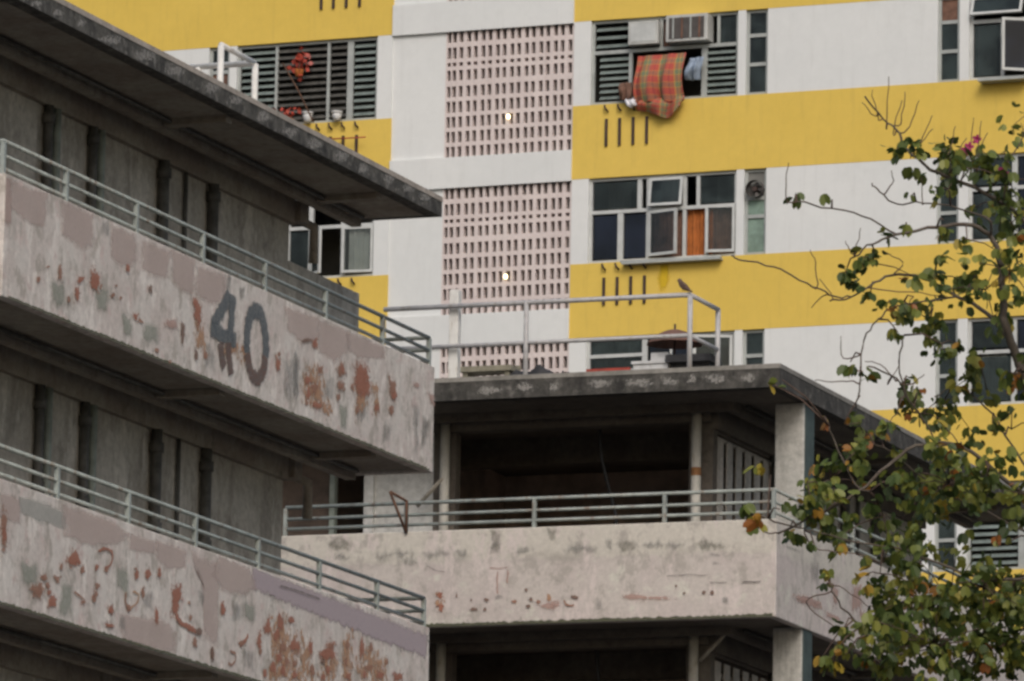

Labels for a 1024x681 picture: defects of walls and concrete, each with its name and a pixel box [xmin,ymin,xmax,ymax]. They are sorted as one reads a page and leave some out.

spalling [300,358,397,418]
spalling [29,547,113,609]
spalling [105,566,202,647]
spalling [511,588,578,609]
spalling [228,613,403,681]